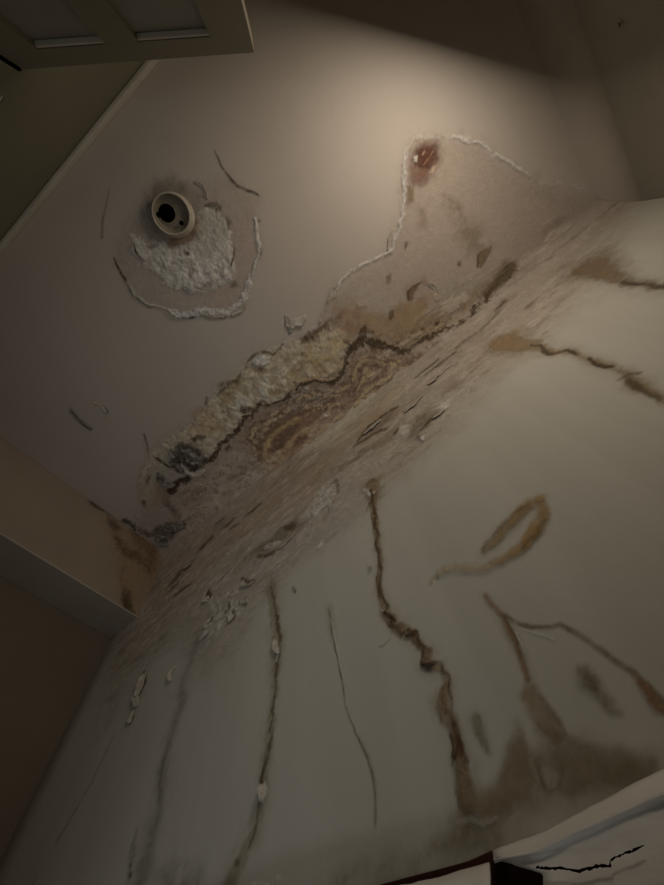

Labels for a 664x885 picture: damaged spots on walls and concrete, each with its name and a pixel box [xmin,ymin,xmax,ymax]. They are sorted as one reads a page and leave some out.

leakage [572,257,664,290]
leakage [490,333,664,400]
flaking render [107,136,615,724]
leakage [431,495,549,583]
leakage [452,595,664,842]
crack [536,845,645,873]